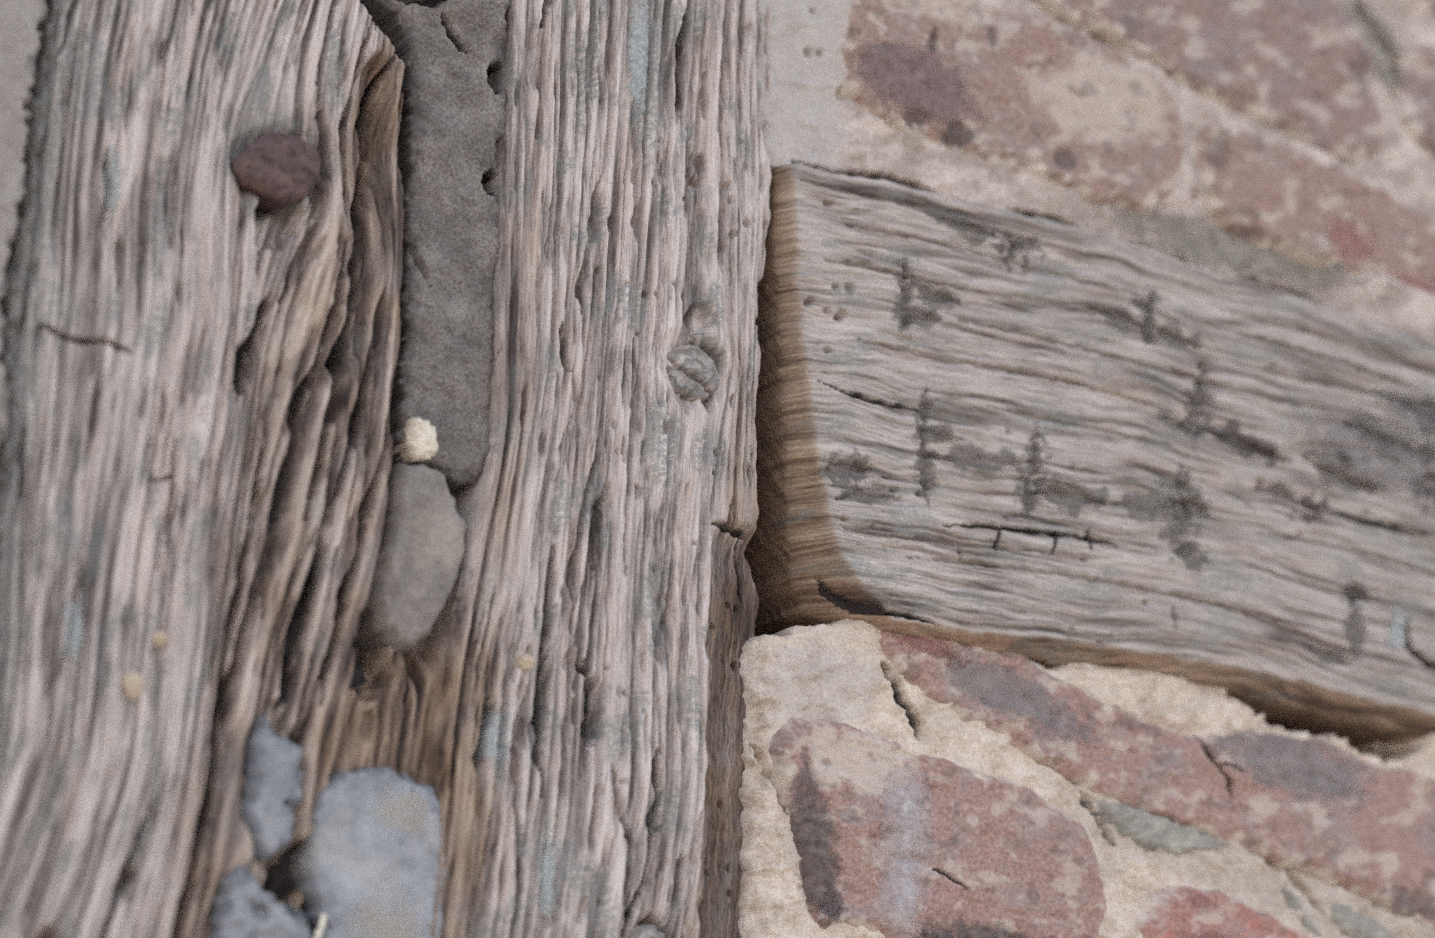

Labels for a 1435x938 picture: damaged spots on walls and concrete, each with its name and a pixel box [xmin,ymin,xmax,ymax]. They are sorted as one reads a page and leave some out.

crack [882,670,915,730]
crack [1205,750,1244,793]